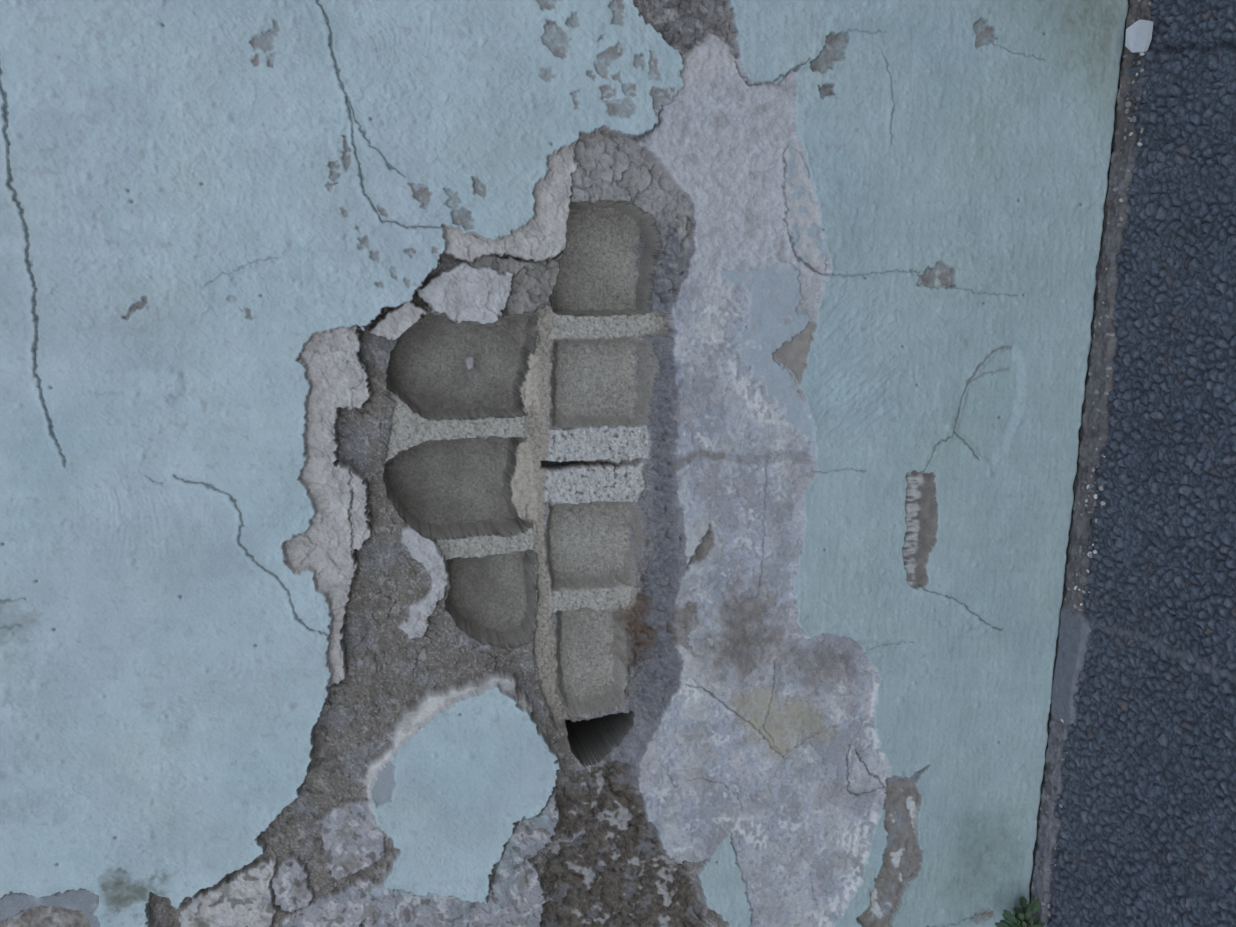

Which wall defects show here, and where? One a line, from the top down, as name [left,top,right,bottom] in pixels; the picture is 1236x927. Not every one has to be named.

peeling [973,17,998,49]
crack [316,0,443,230]
crack [0,60,67,468]
crack [203,255,279,288]
peeling [917,260,956,289]
spalling [121,295,148,319]
spalling [145,0,928,927]
crack [920,431,955,475]
spalling [902,470,938,588]
crack [145,474,331,638]
crack [918,584,1005,632]